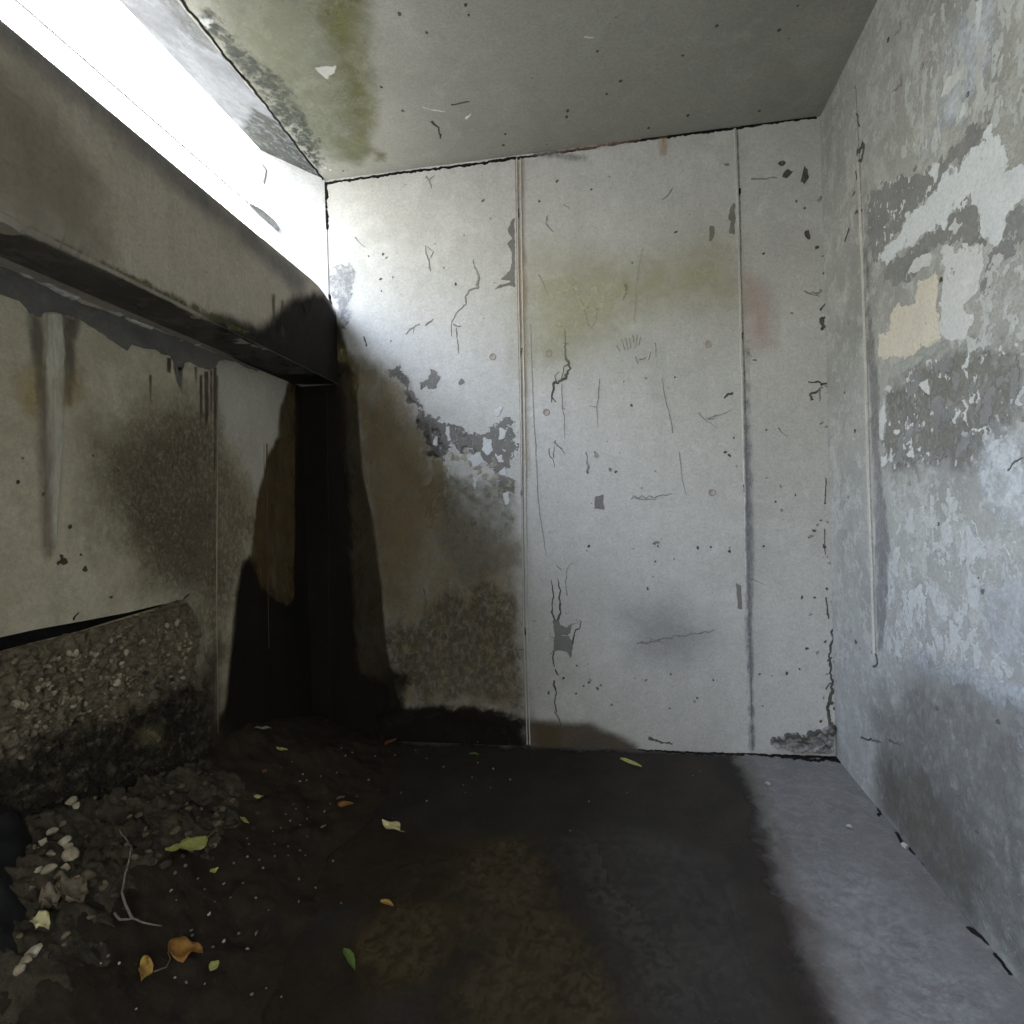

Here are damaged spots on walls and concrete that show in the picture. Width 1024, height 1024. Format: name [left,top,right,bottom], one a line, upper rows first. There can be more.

crack [405,259,480,353]
peeling [866,0,1024,529]
peeling [385,365,520,543]
crack [530,306,598,551]
crack [0,594,190,651]
leakage [0,233,837,1024]
crack [553,680,562,725]
spalling [770,692,837,754]
crack [825,597,834,726]